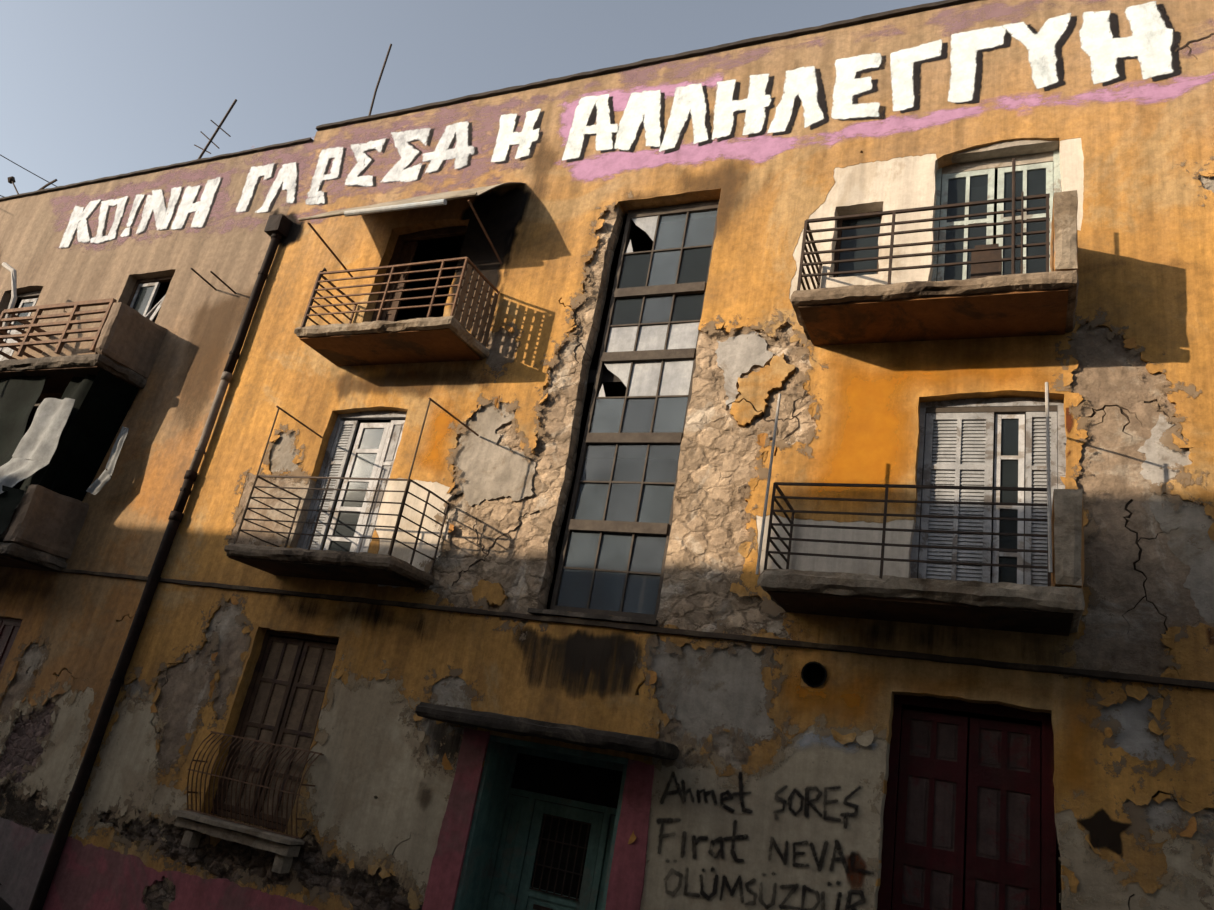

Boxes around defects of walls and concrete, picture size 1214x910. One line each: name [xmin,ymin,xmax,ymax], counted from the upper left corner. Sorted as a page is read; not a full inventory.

peeling [1059,138,1084,231]
flaking render [1180,157,1214,207]
peeling [224,417,316,548]
flaking render [375,191,633,641]
leakage [517,627,640,697]
peeling [627,154,939,910]
flaking render [1049,301,1214,910]
crack [1122,499,1170,652]
peeling [0,590,485,910]